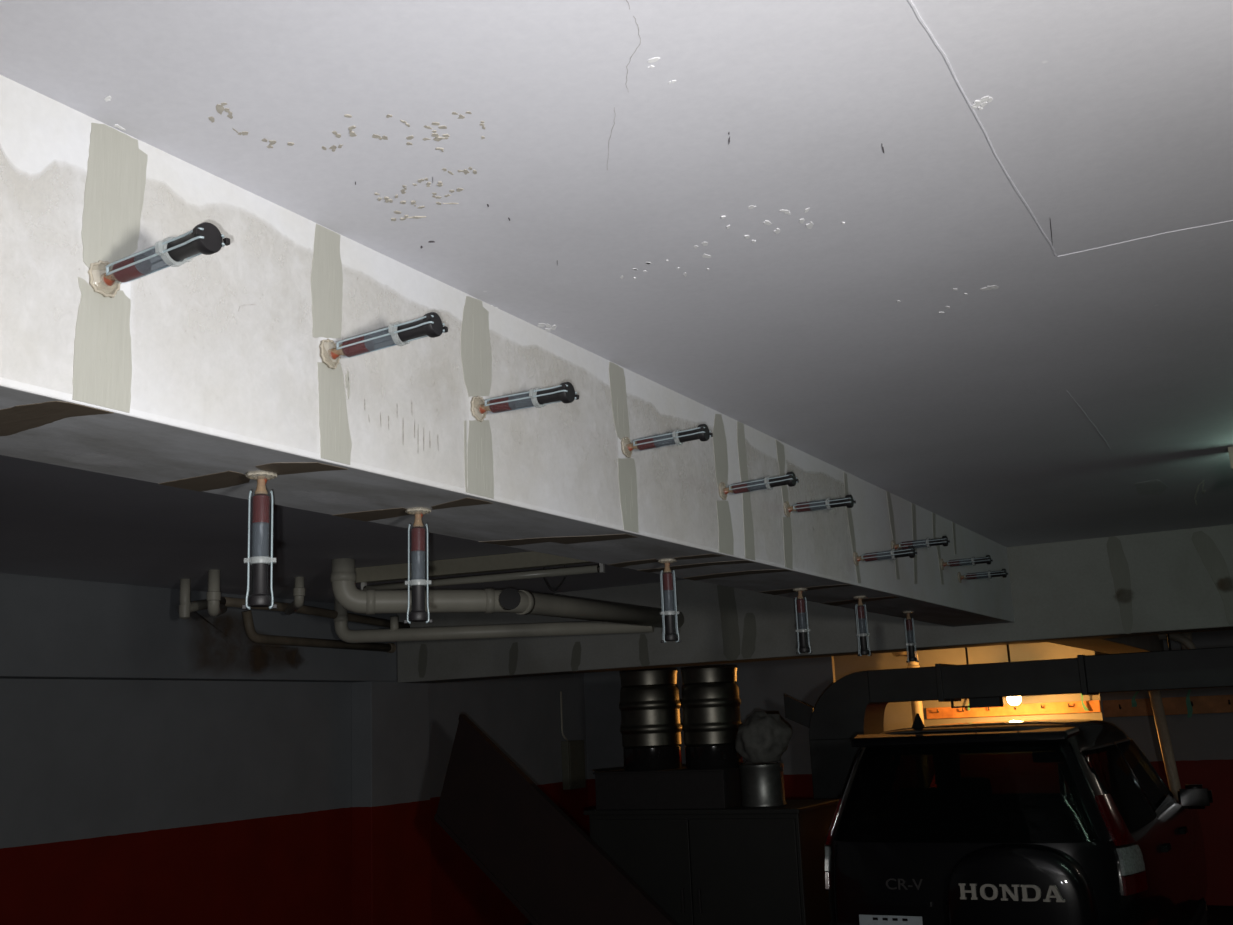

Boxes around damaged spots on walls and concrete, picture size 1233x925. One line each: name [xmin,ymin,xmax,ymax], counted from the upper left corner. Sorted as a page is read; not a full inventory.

crack [607,0,641,170]
peeling [322,114,357,152]
peeling [386,111,485,152]
peeling [374,167,477,221]